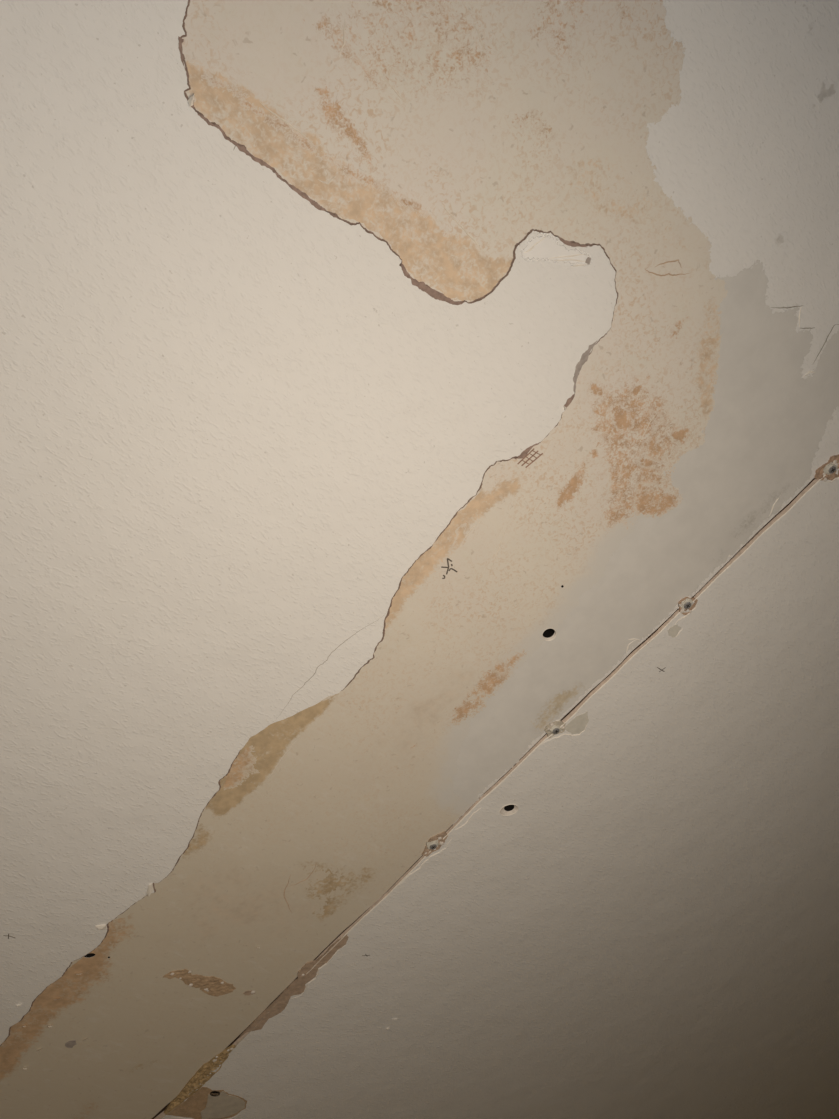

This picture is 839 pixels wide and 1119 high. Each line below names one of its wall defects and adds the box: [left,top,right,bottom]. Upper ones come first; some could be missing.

peeling [186,90,402,260]
damp [186,54,513,301]
peeling [399,262,464,305]
peeling [452,260,839,803]
damp [182,693,339,860]
damp [297,859,396,923]
spalling [422,831,448,857]
crack [152,475,839,1119]
damp [0,913,141,1082]
spalling [163,969,236,997]
spalling [164,1044,236,1115]